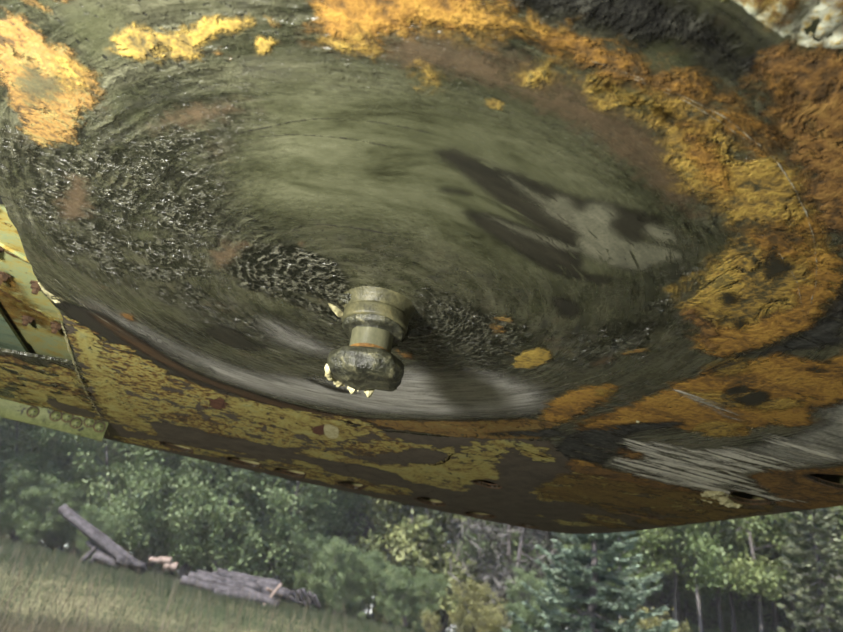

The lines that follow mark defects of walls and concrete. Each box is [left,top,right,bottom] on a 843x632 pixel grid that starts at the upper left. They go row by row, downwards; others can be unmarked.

rust [0,12,104,147]
rust [91,0,843,440]
rust [0,279,64,336]
peeling [0,316,557,496]
rust [618,449,643,460]
rust [537,460,843,529]